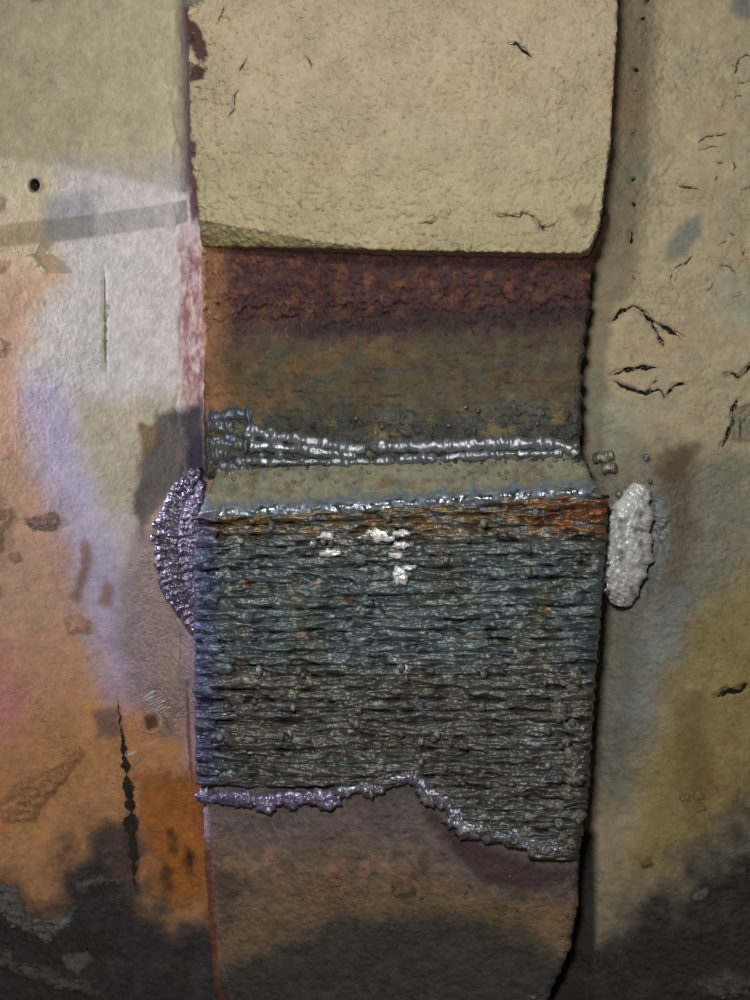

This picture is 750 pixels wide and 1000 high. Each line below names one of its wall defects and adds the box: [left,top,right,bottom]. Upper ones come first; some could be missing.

crack [610,305,685,398]
crack [722,365,750,446]